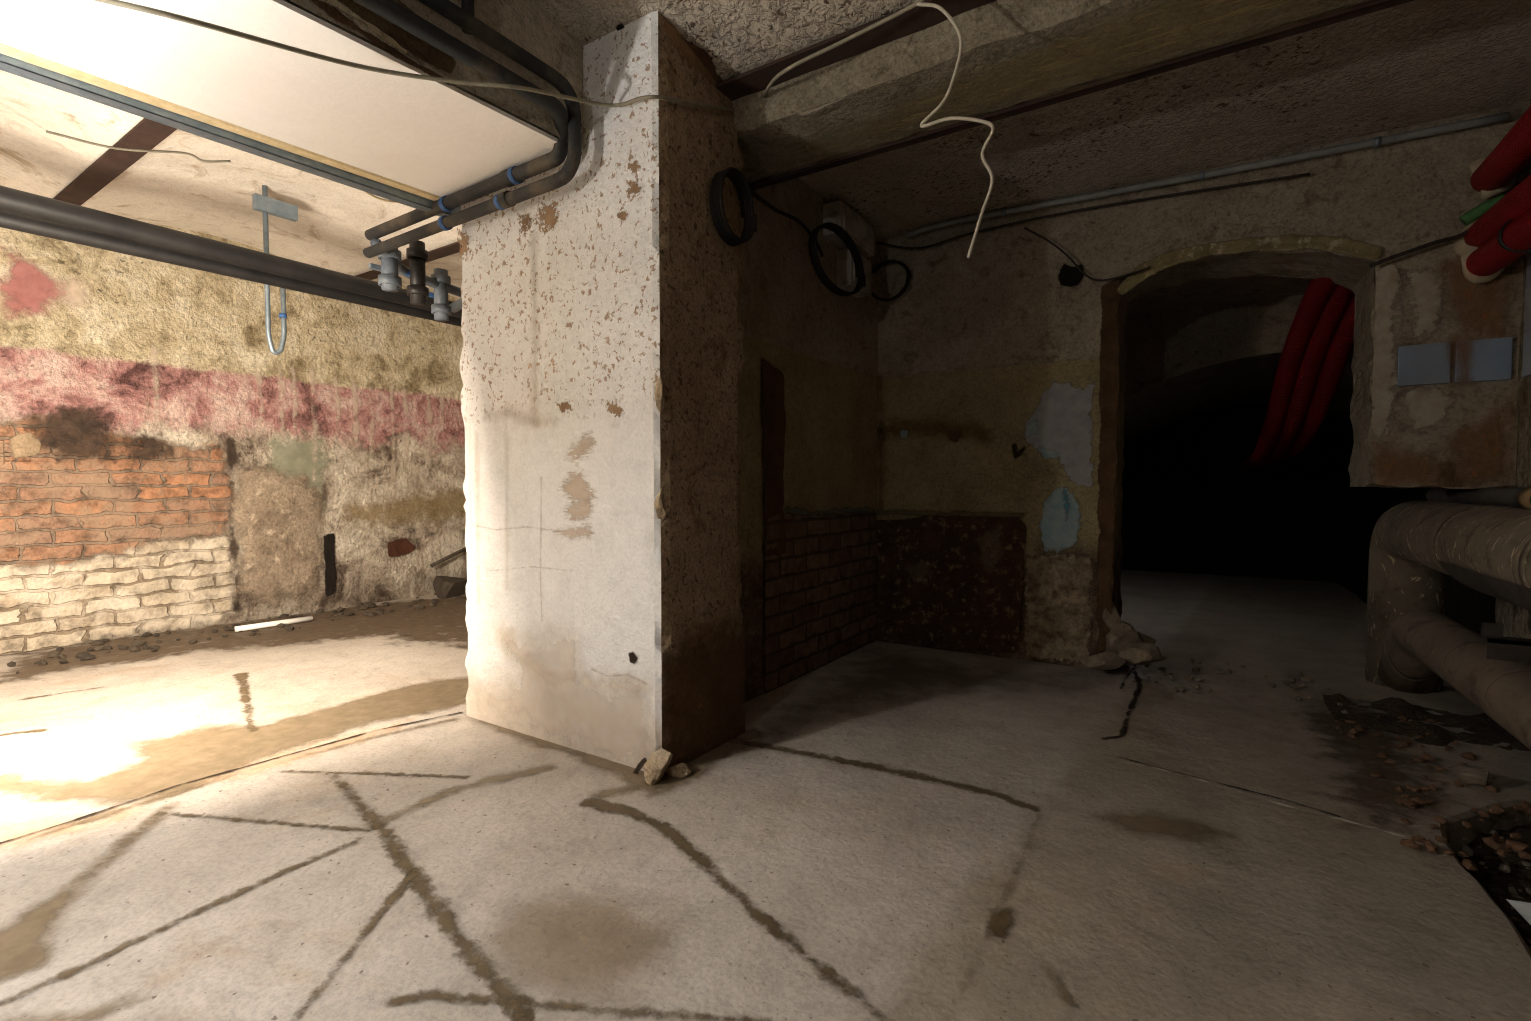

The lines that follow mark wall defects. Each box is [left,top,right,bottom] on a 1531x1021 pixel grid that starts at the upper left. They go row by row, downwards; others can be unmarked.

damp [28,406,174,463]
flaking render [0,414,236,656]
spalling [761,358,786,556]
spalling [876,234,1455,665]
damp [0,678,469,980]
crack [0,672,771,1021]
crack [579,774,882,1016]
crack [730,738,1039,812]
crack [1102,664,1406,837]